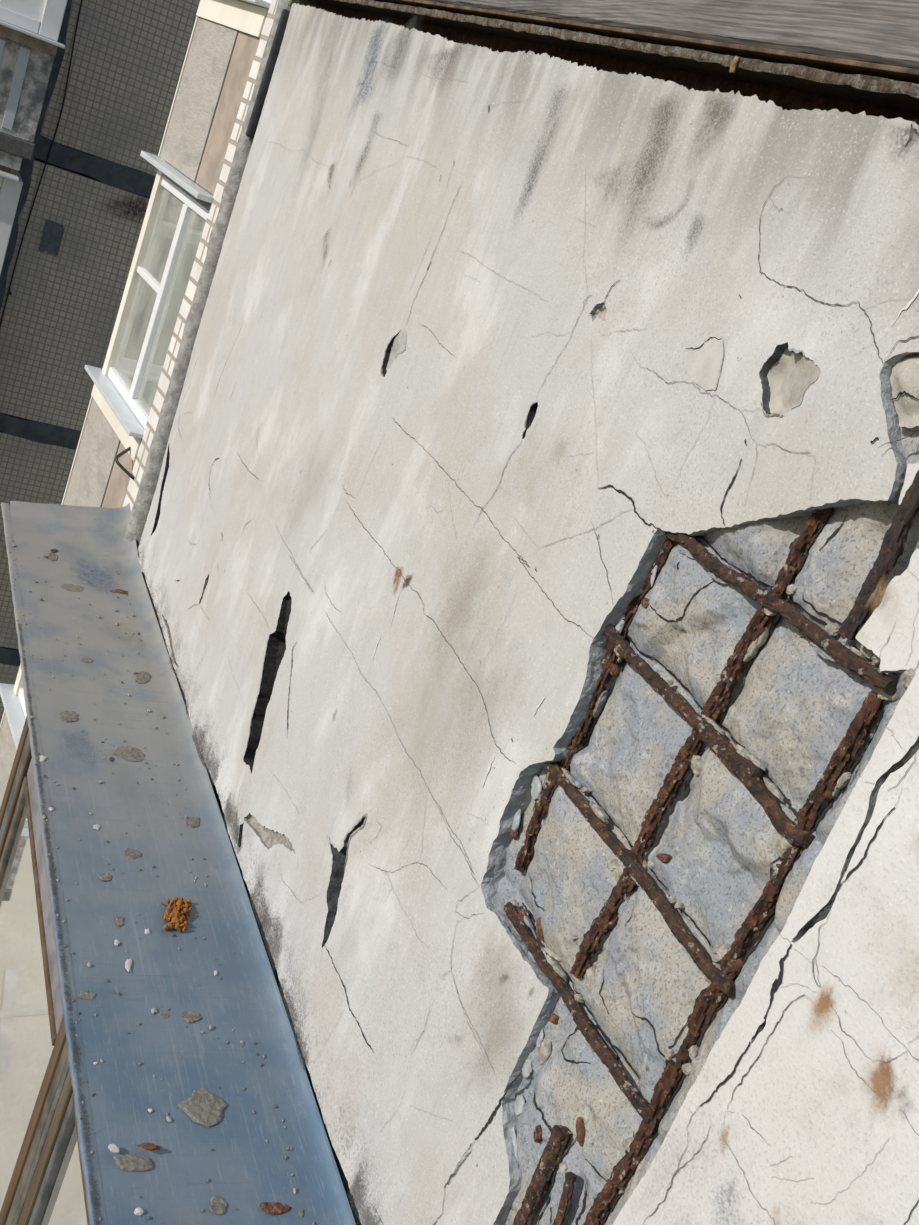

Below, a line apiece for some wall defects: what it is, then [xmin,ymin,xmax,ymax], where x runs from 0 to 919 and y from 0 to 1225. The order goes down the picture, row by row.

water stain [635,104,670,190]
spalling [381,329,407,377]
spalling [243,592,290,773]
spalling [481,338,919,1225]
spalling [322,813,367,947]
crack [643,727,919,1225]
corrosion [817,993,830,1012]
corrosion [873,1060,893,1100]
spalling [339,1167,362,1225]